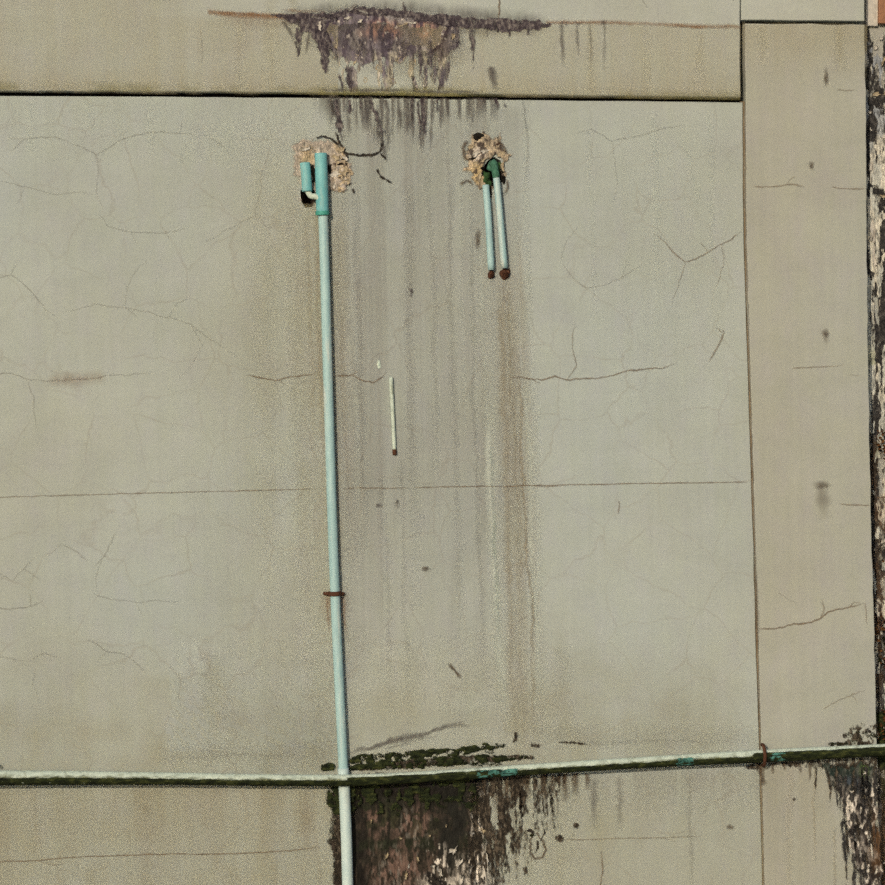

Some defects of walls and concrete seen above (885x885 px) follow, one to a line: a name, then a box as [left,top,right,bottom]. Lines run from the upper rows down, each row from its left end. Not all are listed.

water stain [271,3,551,73]
spalling [292,135,355,193]
water stain [329,97,505,153]
spalling [461,131,511,198]
water stain [863,24,885,712]
peeling [865,37,885,674]
water stain [349,755,494,771]
spalling [327,788,342,885]
spalling [351,778,505,885]
water stain [468,773,589,884]
water stain [746,756,885,885]